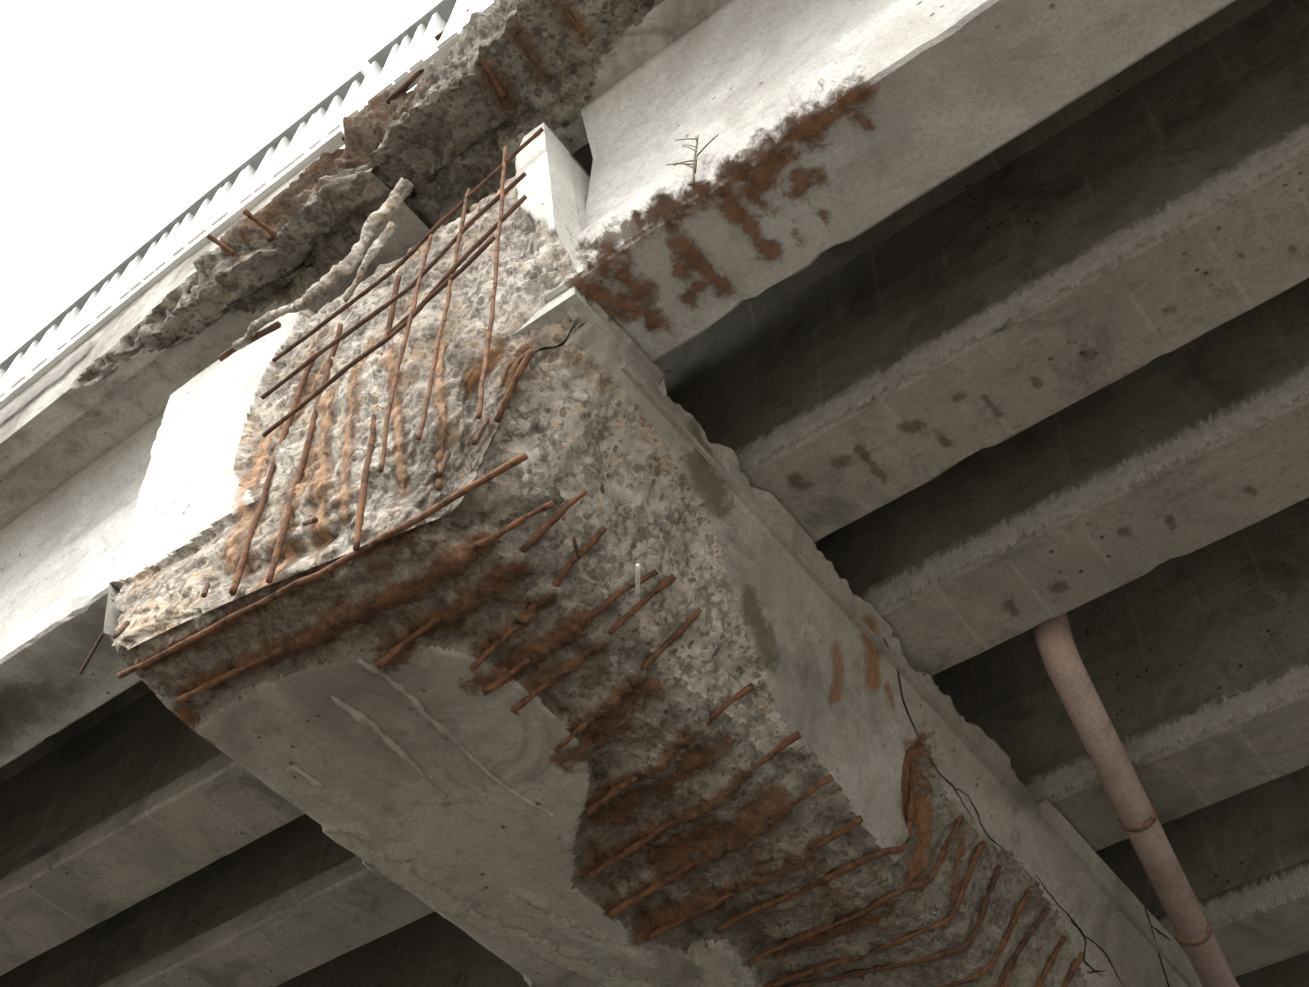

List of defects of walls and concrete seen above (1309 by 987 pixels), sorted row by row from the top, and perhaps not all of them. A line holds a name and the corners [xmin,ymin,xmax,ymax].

rust [564,74,879,333]
rust [226,342,373,587]
rust [385,348,405,485]
rust [434,345,445,487]
spalling [77,0,1089,987]
rust [191,532,496,691]
rust [376,558,534,673]
rust [461,609,592,692]
rust [550,674,664,771]
rust [901,732,935,884]
crack [883,638,1008,855]
crack [1036,875,1123,985]